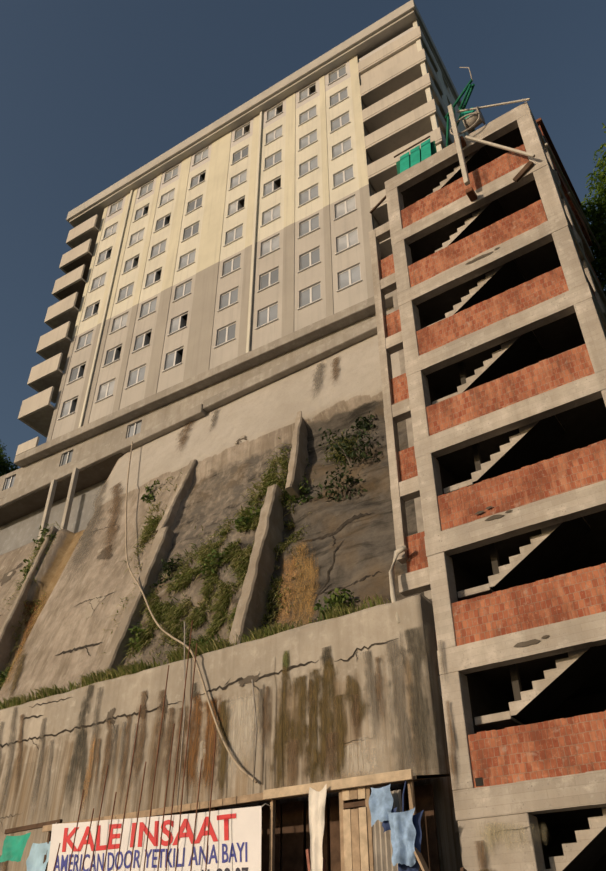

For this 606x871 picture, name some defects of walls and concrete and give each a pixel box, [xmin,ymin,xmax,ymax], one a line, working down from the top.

leakage [313,357,340,390]
crack [270,513,382,614]
spalling [514,635,549,647]
leakage [0,707,24,795]
leakage [32,718,52,806]
leakage [66,685,174,799]
crack [0,638,398,750]
leakage [227,686,270,763]
leakage [288,669,376,786]
leakage [365,628,444,805]